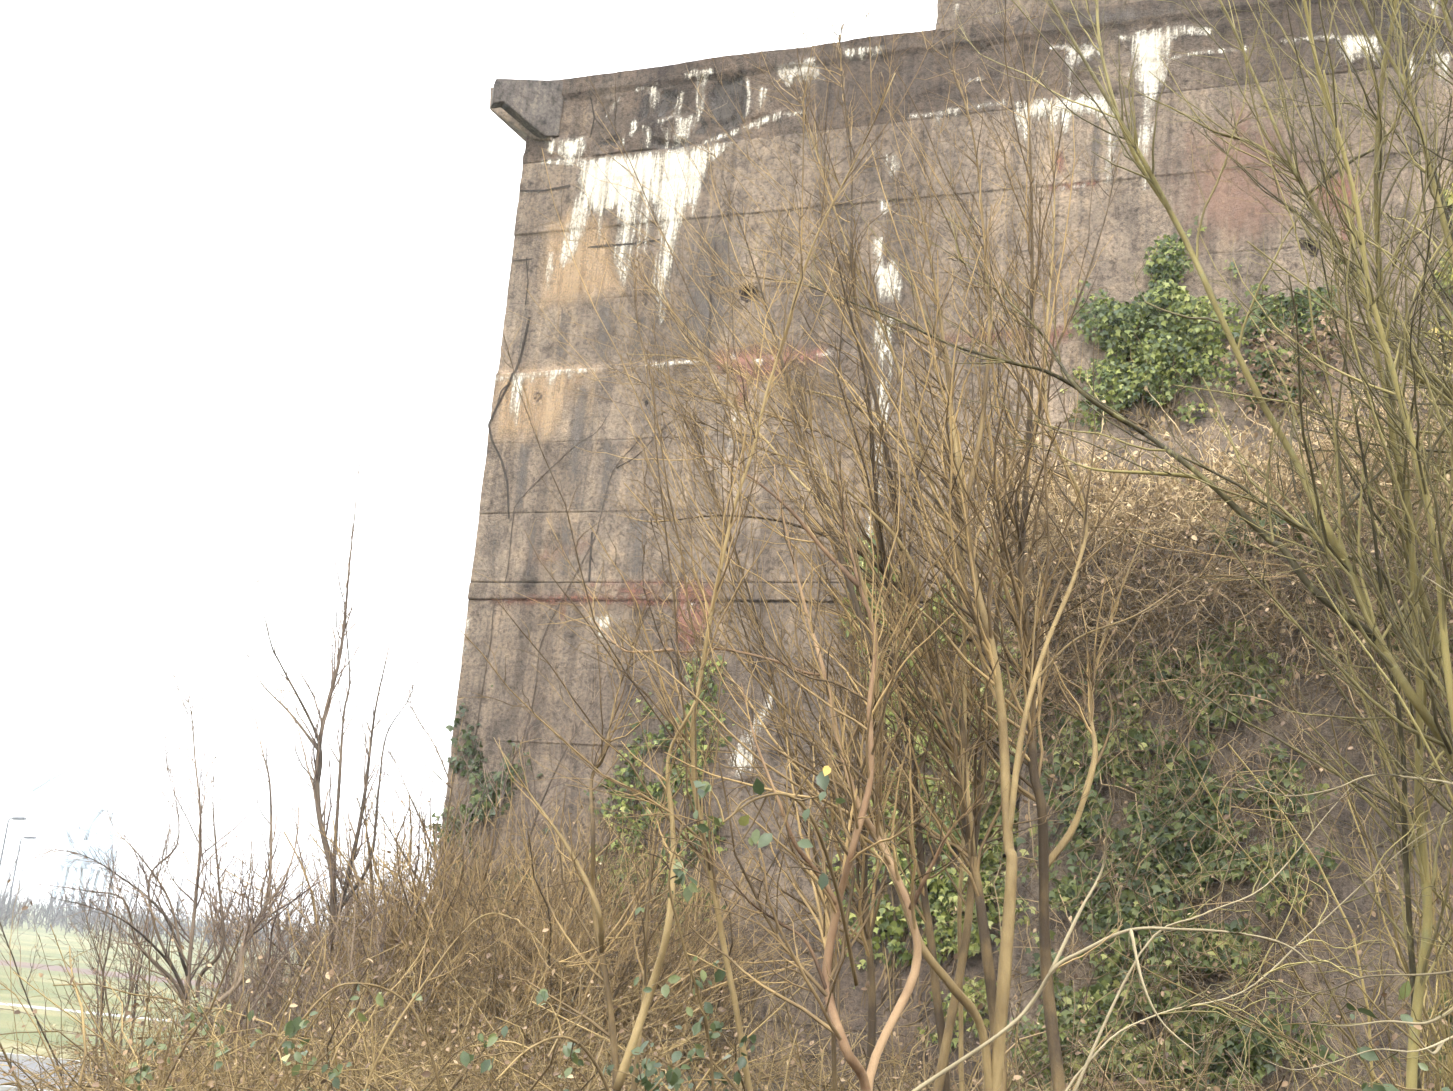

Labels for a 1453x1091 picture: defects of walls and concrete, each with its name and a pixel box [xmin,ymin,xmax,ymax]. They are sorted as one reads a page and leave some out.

leakage [778,58,819,86]
leakage [1001,83,1111,179]
leakage [1050,45,1100,65]
leakage [1093,9,1224,186]
leakage [547,69,801,317]
leakage [874,237,902,300]
leakage [874,317,893,425]